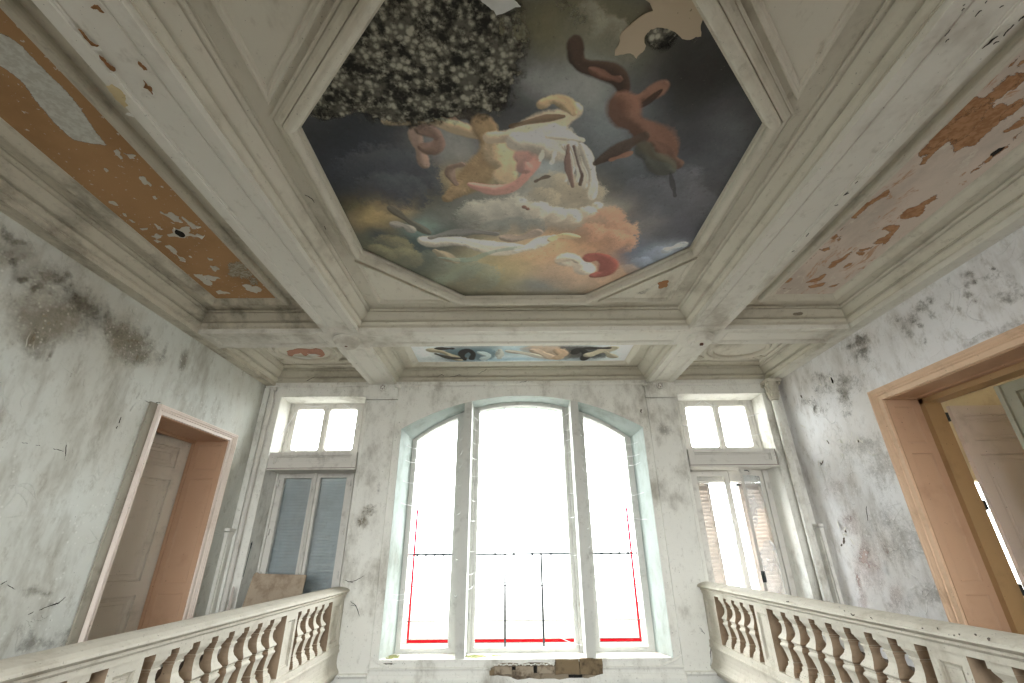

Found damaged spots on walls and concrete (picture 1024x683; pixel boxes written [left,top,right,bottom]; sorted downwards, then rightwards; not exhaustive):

flaking render [481,0,521,15]
flaking render [615,0,703,59]
peeling [78,29,134,117]
peeling [919,56,1024,173]
peeling [109,176,205,262]
peeling [851,190,890,218]
peeling [806,195,938,288]
peeling [194,258,230,294]
peeling [242,284,262,293]
peeling [287,348,325,359]
spalling [483,658,603,680]